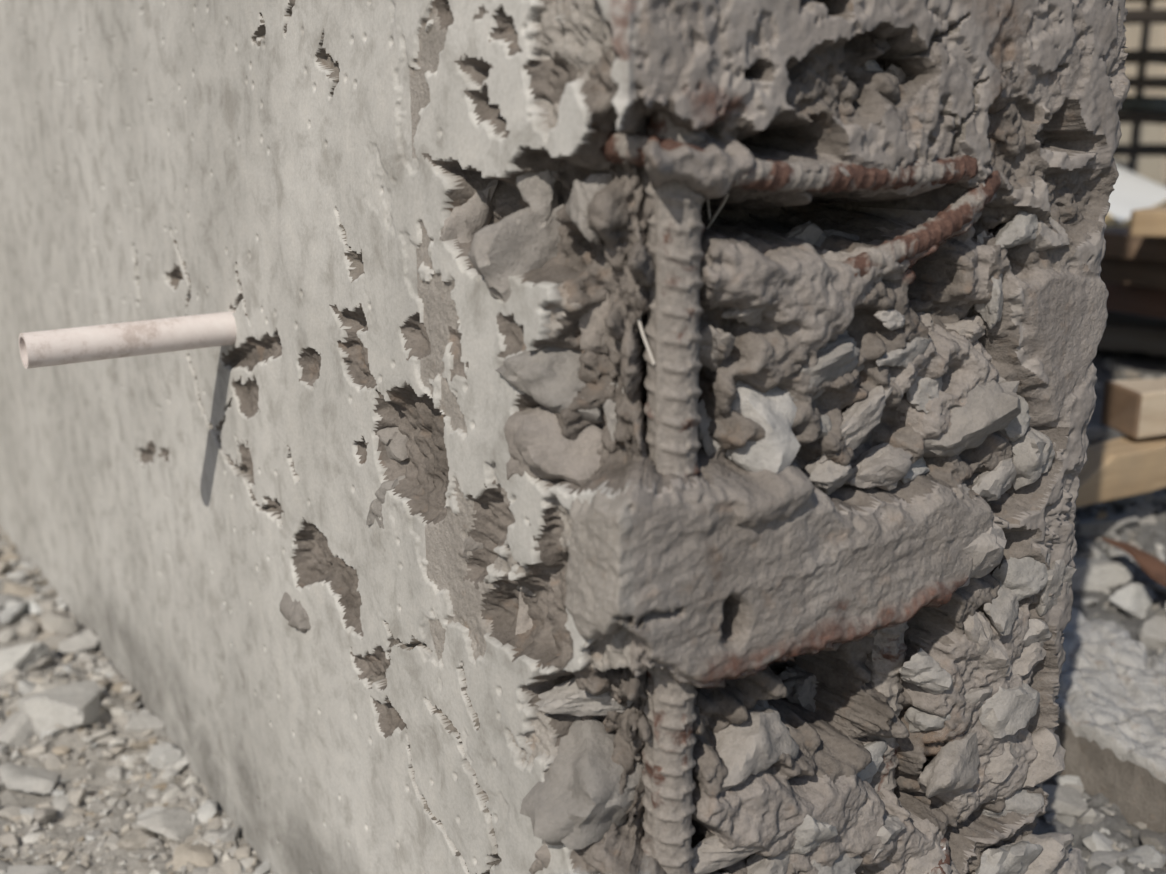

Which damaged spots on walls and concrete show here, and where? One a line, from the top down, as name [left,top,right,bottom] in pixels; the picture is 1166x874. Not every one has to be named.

peeling [408,0,454,158]
spalling [454,53,510,138]
peeling [987,14,1128,133]
spalling [473,0,1002,478]
peeling [416,219,467,433]
peeling [1005,263,1109,427]
peeling [425,476,532,661]
peeling [509,711,559,770]
peeling [551,500,573,552]
peeling [583,625,631,672]
peeling [640,667,1086,874]
peeling [864,601,1038,822]